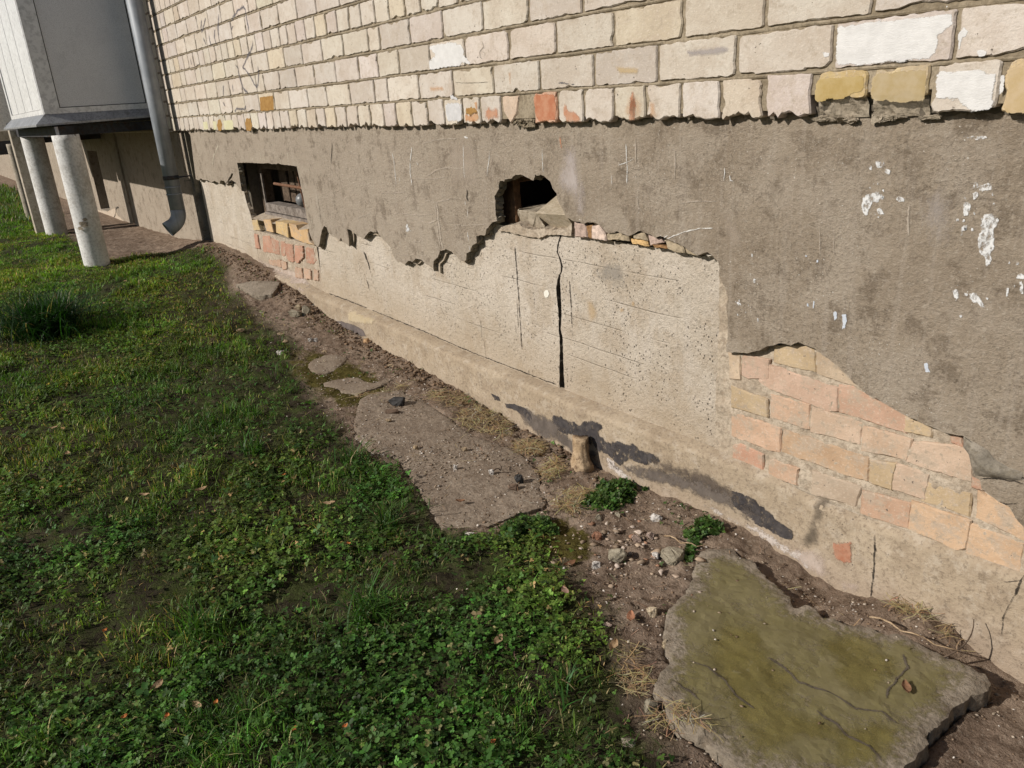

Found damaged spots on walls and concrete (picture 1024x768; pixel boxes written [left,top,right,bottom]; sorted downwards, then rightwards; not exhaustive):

peeling [823,6,968,66]
peeling [808,50,1013,124]
flaking render [318,176,1024,573]
crack [869,535,877,597]